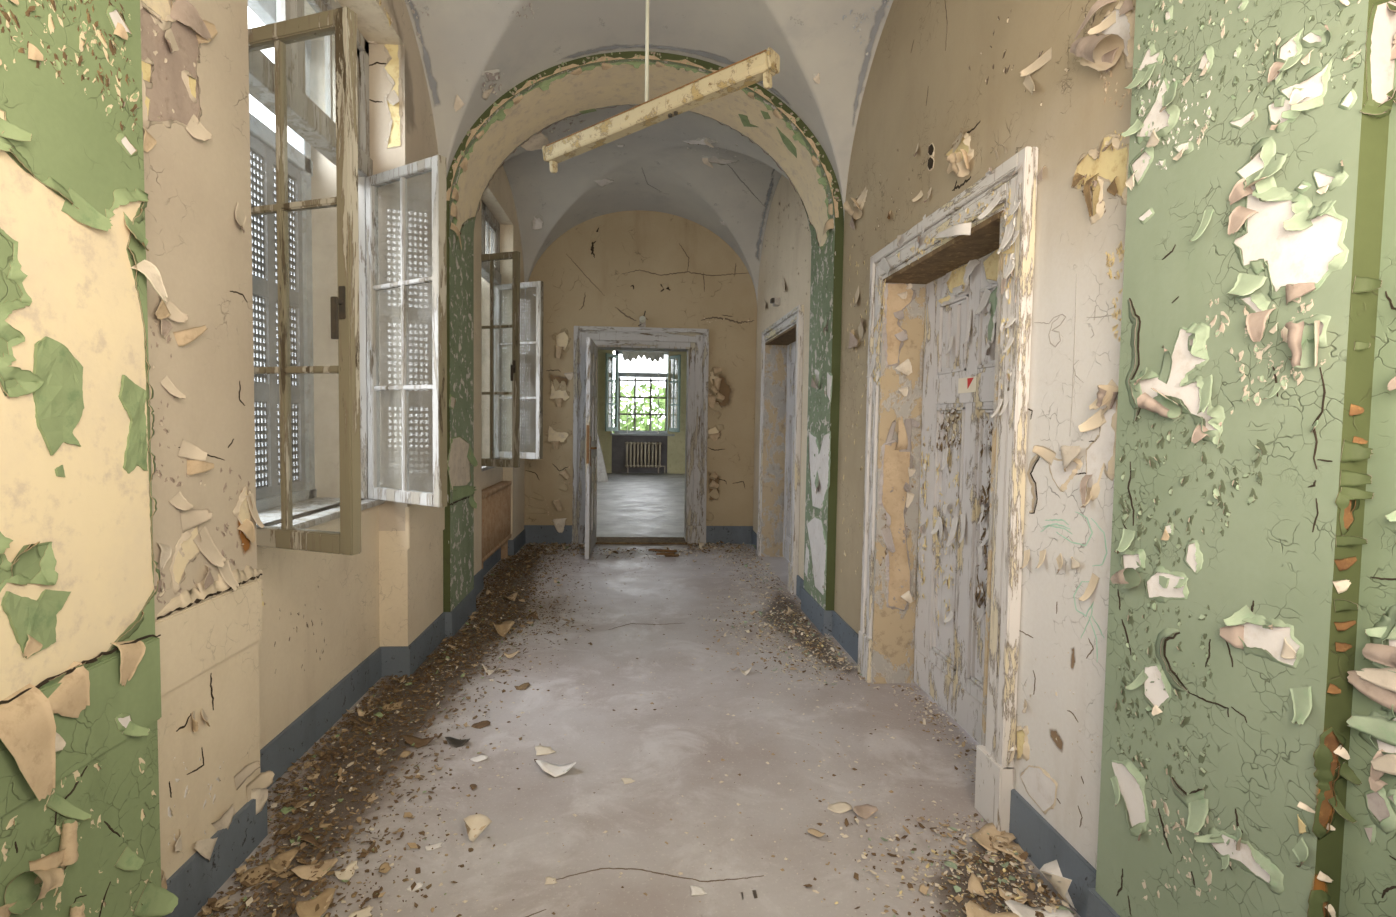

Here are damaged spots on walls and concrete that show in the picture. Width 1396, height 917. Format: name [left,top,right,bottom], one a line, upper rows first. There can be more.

peeling [446,51,721,257]
crack [567,228,754,325]
peeling [0,107,325,917]
peeling [447,354,478,511]
peeling [524,425,572,533]
peeling [547,328,573,407]
peeling [683,86,1022,626]
peeling [981,0,1396,901]
crack [1117,589,1247,723]
peeling [201,849,358,917]
crack [1116,869,1131,915]
crack [1158,777,1243,886]